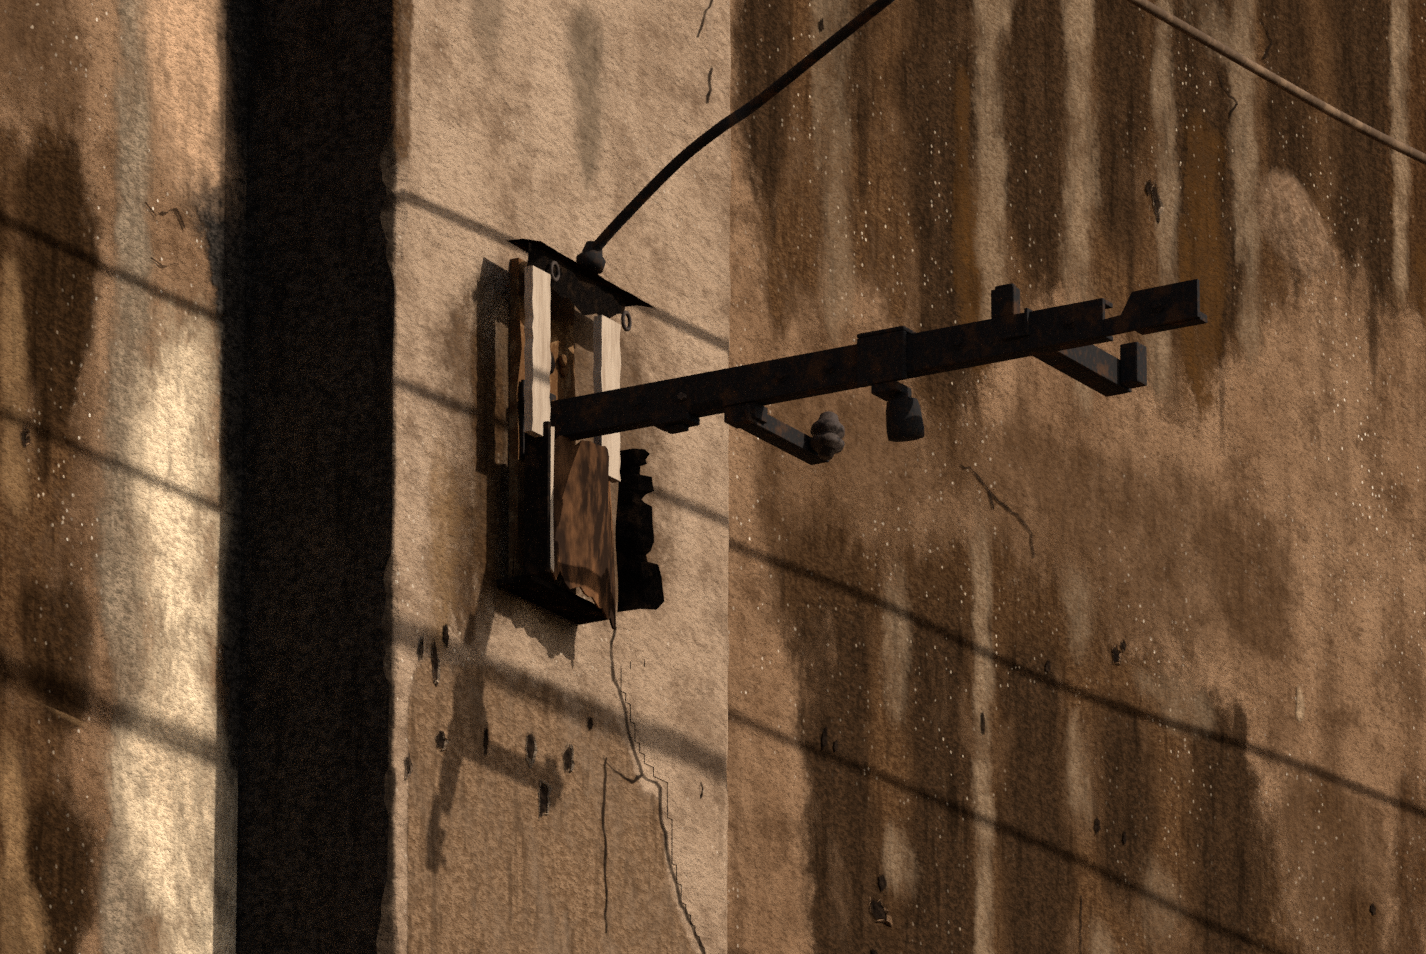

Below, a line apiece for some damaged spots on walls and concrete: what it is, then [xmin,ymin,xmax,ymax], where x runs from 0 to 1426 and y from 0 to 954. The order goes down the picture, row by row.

crack [697,0,713,103]
leakage [733,0,1426,402]
leakage [0,0,414,954]
peeling [405,624,695,954]
crack [602,627,706,954]
leakage [777,500,1378,954]
leakage [1385,778,1426,954]